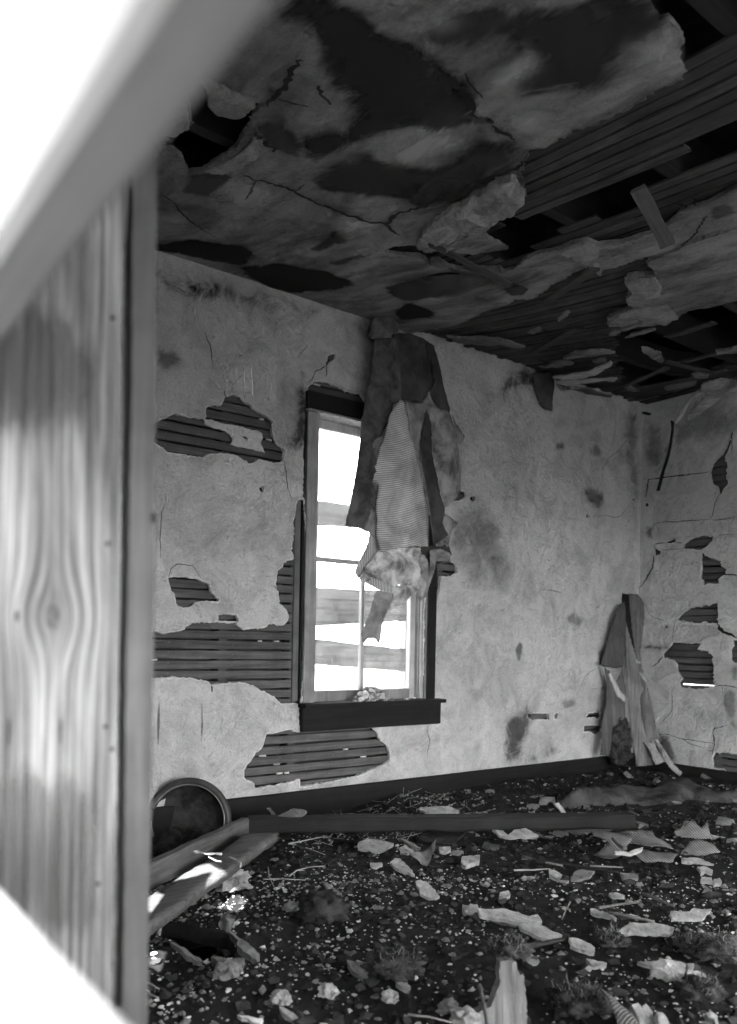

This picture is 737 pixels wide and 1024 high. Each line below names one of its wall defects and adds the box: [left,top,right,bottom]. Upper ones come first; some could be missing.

leakage [183,173,229,197]
crack [266,59,332,107]
crack [207,73,527,235]
leakage [258,0,665,207]
flaking render [384,0,737,273]
leakage [157,240,362,293]
leakage [386,272,528,320]
flaking render [420,226,737,404]
flaking render [154,393,391,789]
flaking render [653,534,728,587]
flaking render [662,601,737,691]
leakage [506,707,530,760]